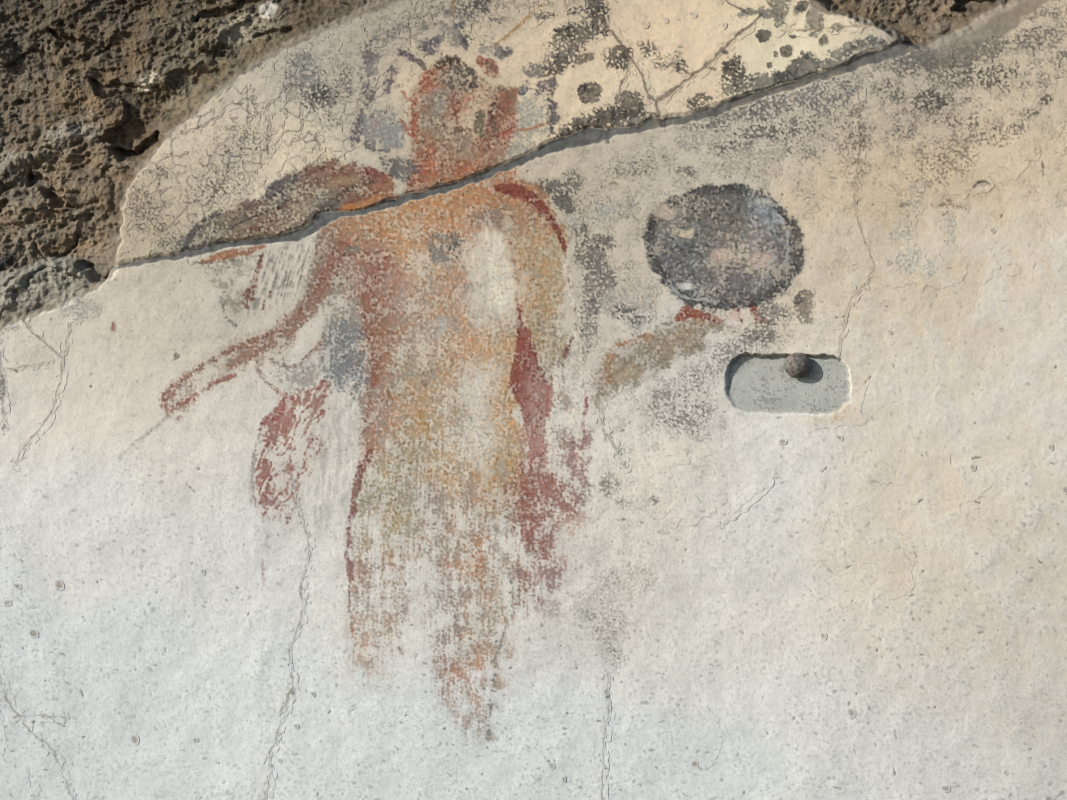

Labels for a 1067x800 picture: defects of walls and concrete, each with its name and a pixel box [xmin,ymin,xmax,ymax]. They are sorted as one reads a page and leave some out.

water stain [441,0,502,50]
spalling [953,0,1001,17]
spalling [26,174,76,210]
spalling [108,131,160,164]
crack [119,0,877,266]
water stain [530,0,1067,297]
crack [833,78,881,357]
peeling [886,174,939,280]
crack [0,314,74,471]
spalling [727,355,851,415]
crack [254,471,316,800]
crack [0,664,76,800]